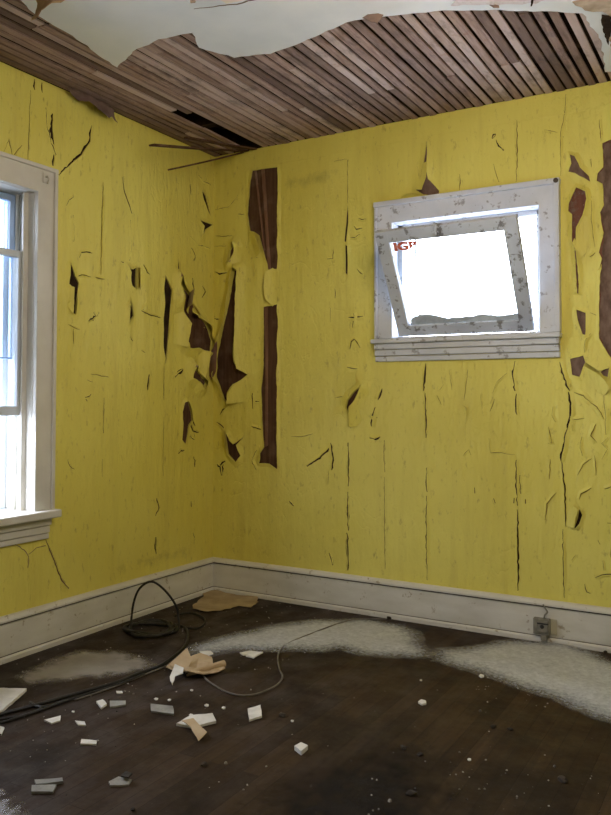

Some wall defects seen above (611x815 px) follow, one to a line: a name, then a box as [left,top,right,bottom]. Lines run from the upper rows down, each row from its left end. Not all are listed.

spalling [601,15,611,45]
peeling [564,103,611,395]
peeling [63,256,82,321]
peeling [123,261,143,328]
peeling [159,164,282,473]
crack [0,539,70,589]